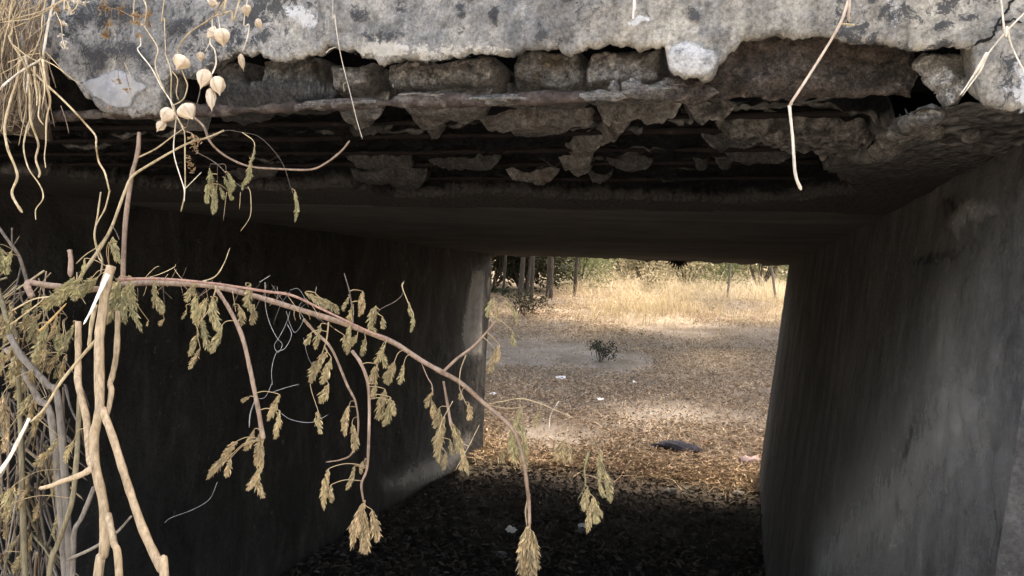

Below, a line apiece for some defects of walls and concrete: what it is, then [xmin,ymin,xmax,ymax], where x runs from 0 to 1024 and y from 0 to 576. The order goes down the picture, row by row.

spalling [0,36,967,191]